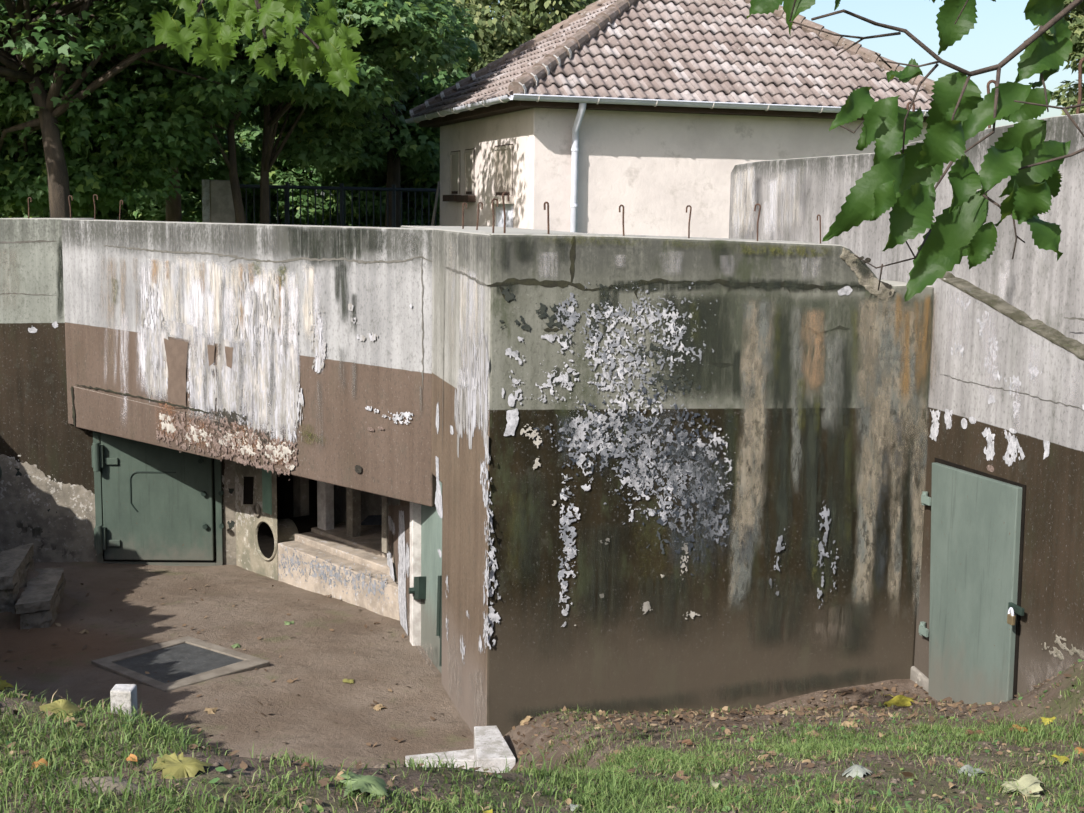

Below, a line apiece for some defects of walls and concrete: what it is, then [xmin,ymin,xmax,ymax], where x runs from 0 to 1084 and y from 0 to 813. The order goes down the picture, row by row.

peeling [141,271,326,565]
water stain [138,227,383,433]
peeling [348,303,378,342]
peeling [365,406,413,431]
peeling [435,336,501,652]
crack [104,236,872,384]
water stain [501,238,530,267]
peeling [500,281,739,627]
water stain [591,259,935,604]
corrosion [805,313,823,383]
peeling [929,304,1042,472]